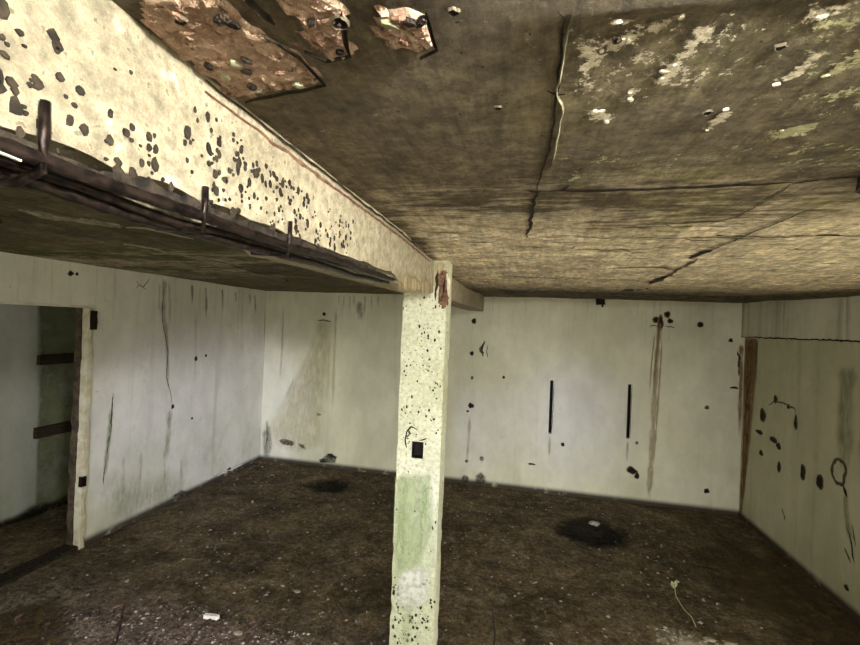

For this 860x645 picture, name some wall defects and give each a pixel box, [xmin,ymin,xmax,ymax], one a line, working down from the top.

peeling [213,14,241,30]
peeling [307,18,336,40]
peeling [380,15,428,47]
peeling [204,56,263,93]
crack [526,11,858,284]
spalling [0,99,397,284]
corrosion [647,323,662,491]